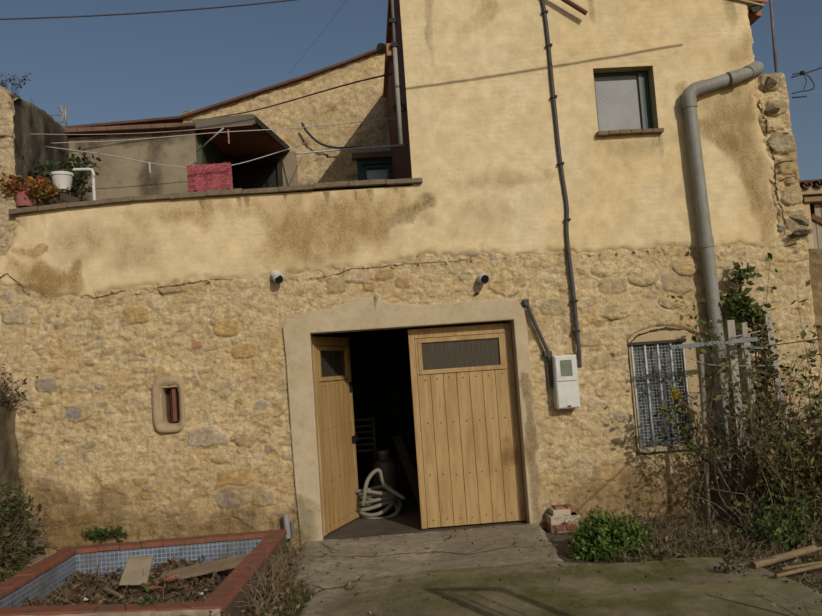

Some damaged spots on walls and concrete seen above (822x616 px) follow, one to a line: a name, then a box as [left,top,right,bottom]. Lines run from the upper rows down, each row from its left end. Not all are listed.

leakage [711,85,766,202]
leakage [19,261,82,298]